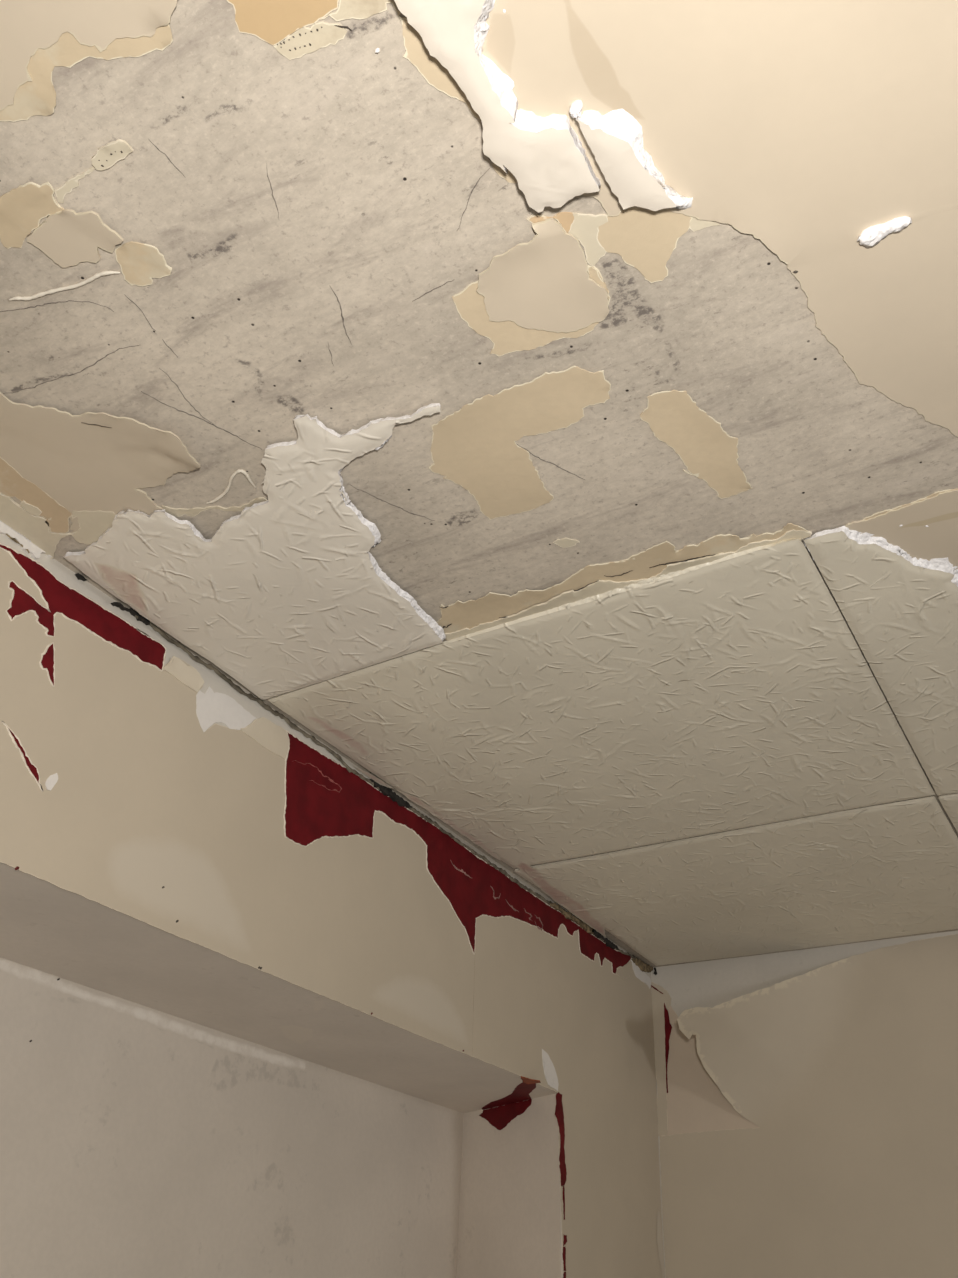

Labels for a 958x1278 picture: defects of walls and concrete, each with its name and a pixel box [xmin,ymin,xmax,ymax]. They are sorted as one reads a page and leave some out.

peeling [91,139,134,170]
peeling [0,182,172,286]
peeling [452,0,958,437]
peeling [0,392,267,559]
peeling [437,523,812,641]
peeling [640,390,753,499]
peeling [845,488,958,570]
peeling [555,1092,567,1220]